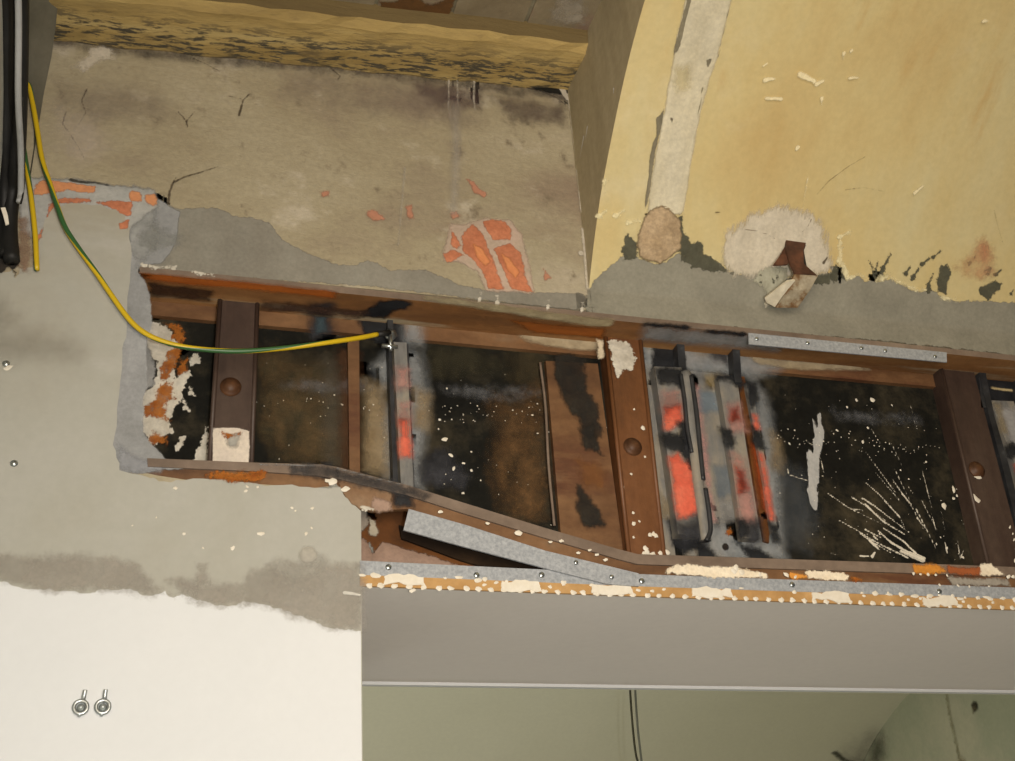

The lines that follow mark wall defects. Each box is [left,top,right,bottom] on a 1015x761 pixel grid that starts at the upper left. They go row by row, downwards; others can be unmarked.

crack [167,168,213,204]
spalling [0,177,1015,355]
peeling [188,353,201,366]
peeling [194,426,209,461]
leakage [21,558,150,591]
leakage [262,565,363,627]